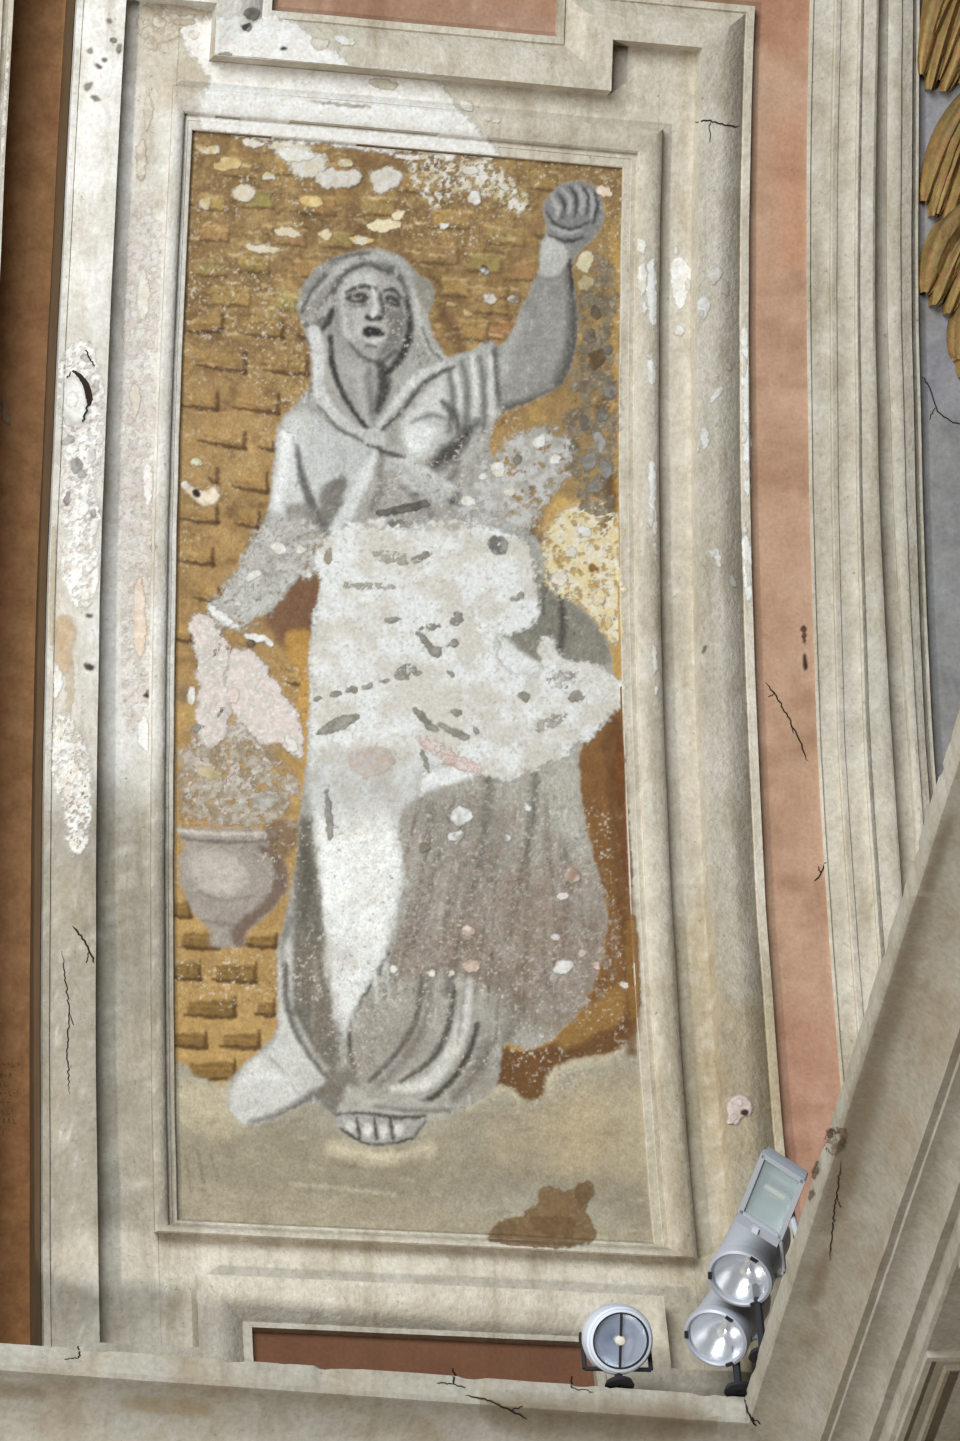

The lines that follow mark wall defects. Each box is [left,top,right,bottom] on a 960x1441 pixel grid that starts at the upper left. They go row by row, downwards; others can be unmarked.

peeling [135,3,531,229]
peeling [246,226,300,254]
peeling [350,210,405,245]
peeling [576,251,594,273]
peeling [596,185,612,197]
peeling [483,293,520,305]
crack [66,350,94,423]
peeling [177,426,628,1020]
crack [765,682,808,761]
damp [603,721,641,1054]
crack [62,926,94,1087]
damp [488,1181,596,1249]